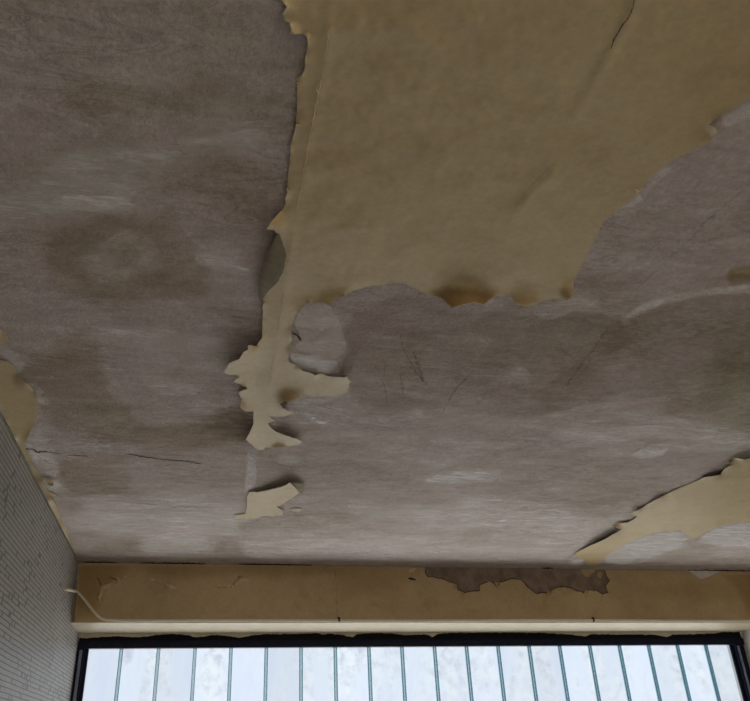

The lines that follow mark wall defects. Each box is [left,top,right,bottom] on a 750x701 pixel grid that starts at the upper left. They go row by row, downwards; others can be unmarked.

peeling [223,0,750,450]
peeling [0,361,76,555]
peeling [234,482,304,519]
peeling [425,458,750,598]